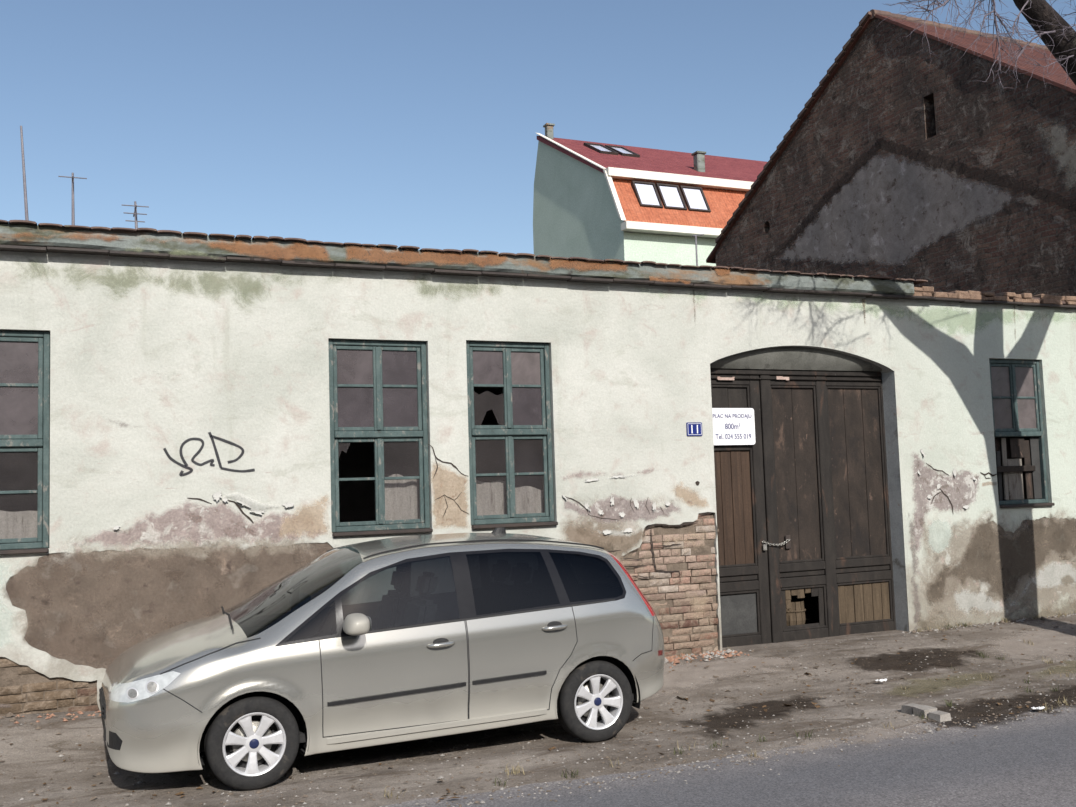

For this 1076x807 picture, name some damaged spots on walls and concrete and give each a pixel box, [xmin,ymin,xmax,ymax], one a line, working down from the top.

flaking render [1038,126,1076,187]
crack [189,498,253,523]
crack [428,444,468,517]
flaking render [432,465,468,526]
crack [928,464,953,512]
flaking render [913,448,1076,621]
flaking render [0,490,334,716]
spalling [563,486,719,657]